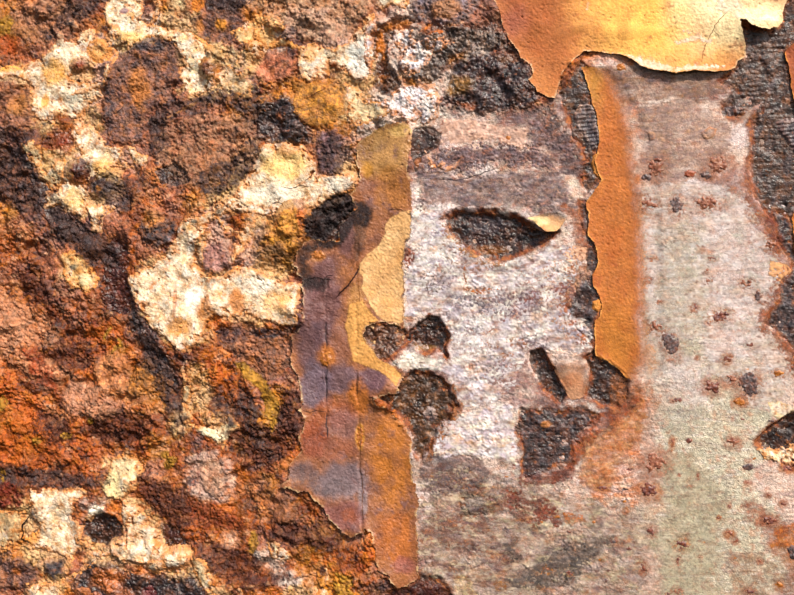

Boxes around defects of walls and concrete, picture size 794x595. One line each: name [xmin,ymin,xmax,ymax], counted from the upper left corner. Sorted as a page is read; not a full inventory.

rust [147,88,260,158]
rust [0,127,120,269]
rust [196,140,259,195]
spalling [444,207,565,262]
peeling [494,0,794,478]
rust [601,63,794,377]
peeling [127,0,460,595]
rust [702,354,765,408]
rust [0,392,111,509]
rust [209,388,303,464]
rust [137,474,244,534]
rust [207,544,289,591]